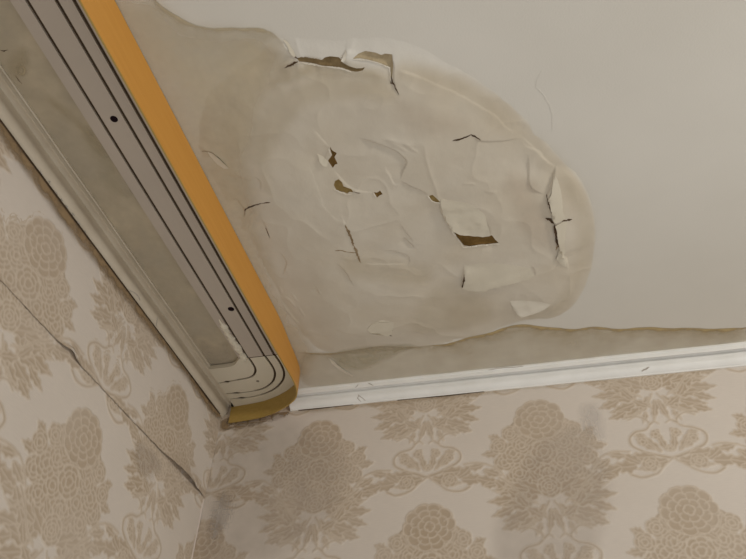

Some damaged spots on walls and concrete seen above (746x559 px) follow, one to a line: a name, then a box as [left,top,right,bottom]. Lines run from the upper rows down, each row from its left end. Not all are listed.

crack [0,119,220,414]
water stain [0,122,289,430]
water stain [121,8,294,335]
crack [336,226,360,262]
crack [546,194,572,250]
water stain [431,324,744,346]